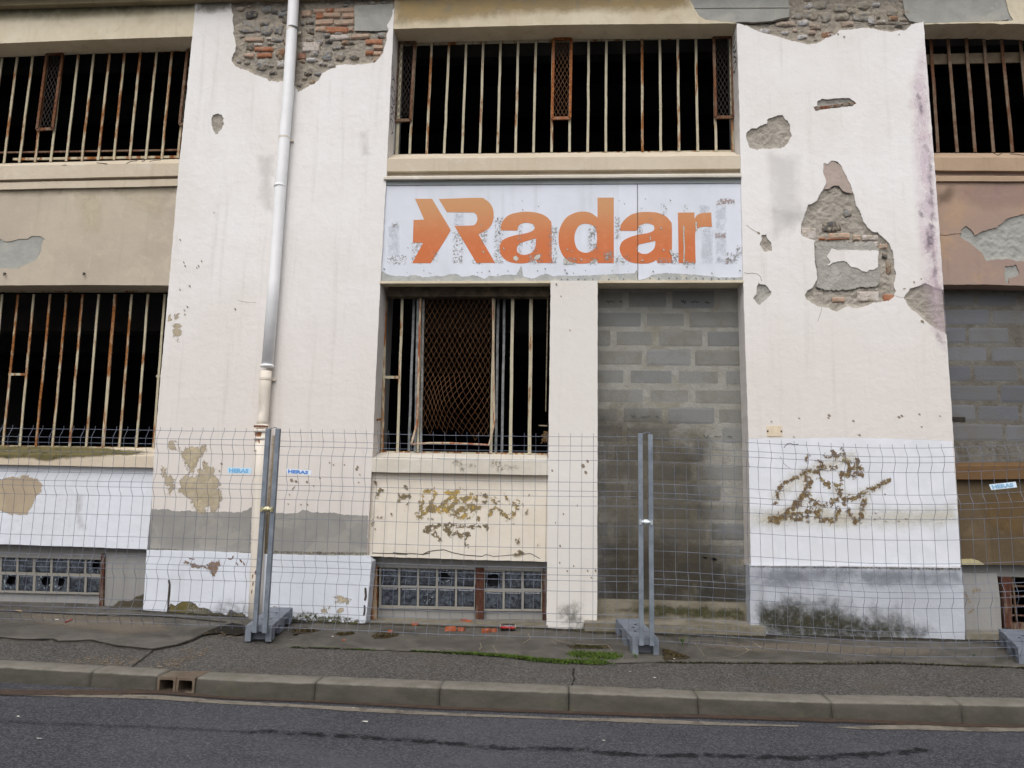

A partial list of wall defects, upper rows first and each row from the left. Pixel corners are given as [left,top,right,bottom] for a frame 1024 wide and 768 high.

spalling [231,0,395,92]
spalling [212,114,224,134]
spalling [746,116,791,150]
spalling [814,99,855,111]
spalling [801,161,946,334]
spalling [753,283,771,305]
peeling [0,475,42,515]
peeling [161,440,223,514]
peeling [371,485,533,548]
peeling [183,560,220,577]
leakage [516,613,616,634]
leakage [654,602,999,643]